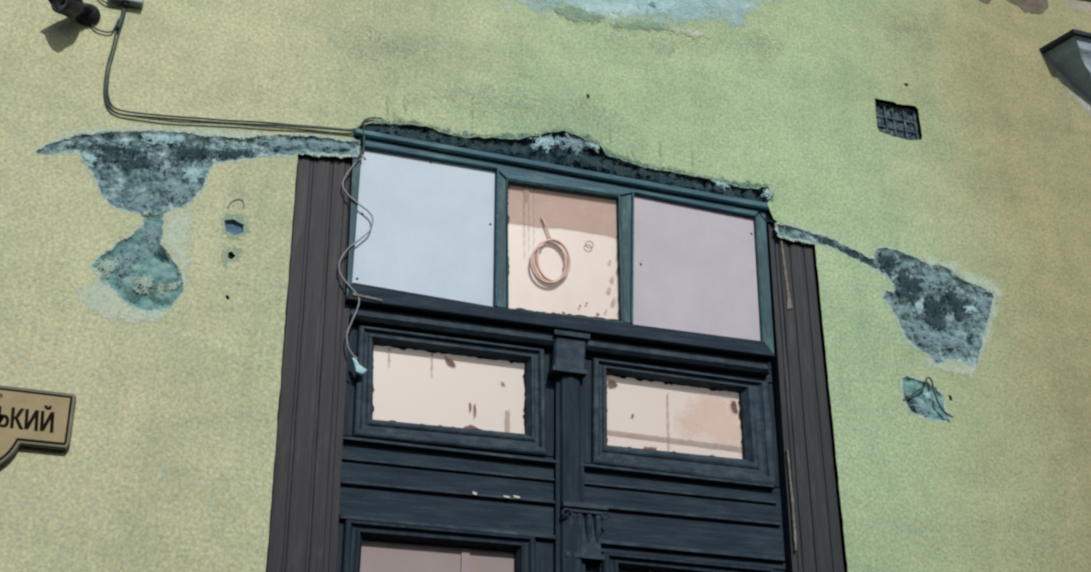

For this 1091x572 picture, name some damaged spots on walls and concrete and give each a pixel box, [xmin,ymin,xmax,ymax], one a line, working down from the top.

flaking render [32,117,1004,378]
flaking render [900,374,952,423]